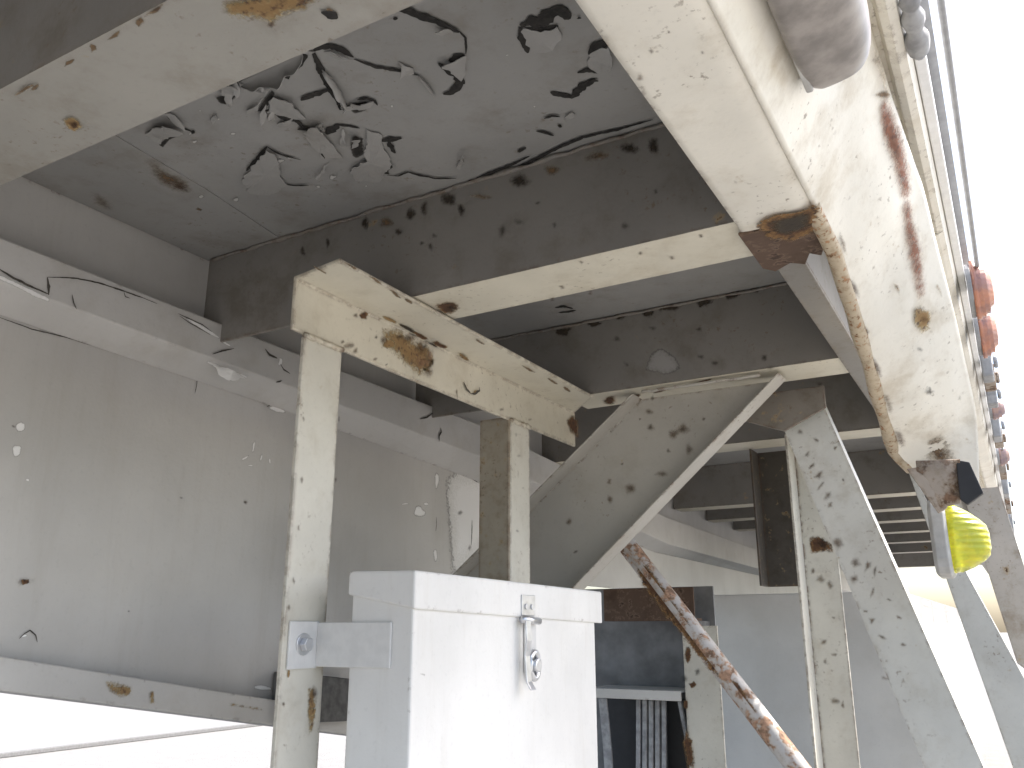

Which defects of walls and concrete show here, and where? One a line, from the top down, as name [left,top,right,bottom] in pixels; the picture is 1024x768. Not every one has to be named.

peeling [321,8,338,20]
peeling [517,5,581,53]
peeling [577,41,613,86]
peeling [211,44,466,201]
crack [325,124,359,135]
crack [388,119,653,182]
corrosion [878,91,924,290]
corrosion [756,205,821,241]
corrosion [376,316,447,374]
peeling [402,473,480,574]
corrosion [810,537,840,552]
corrosion [638,566,718,688]